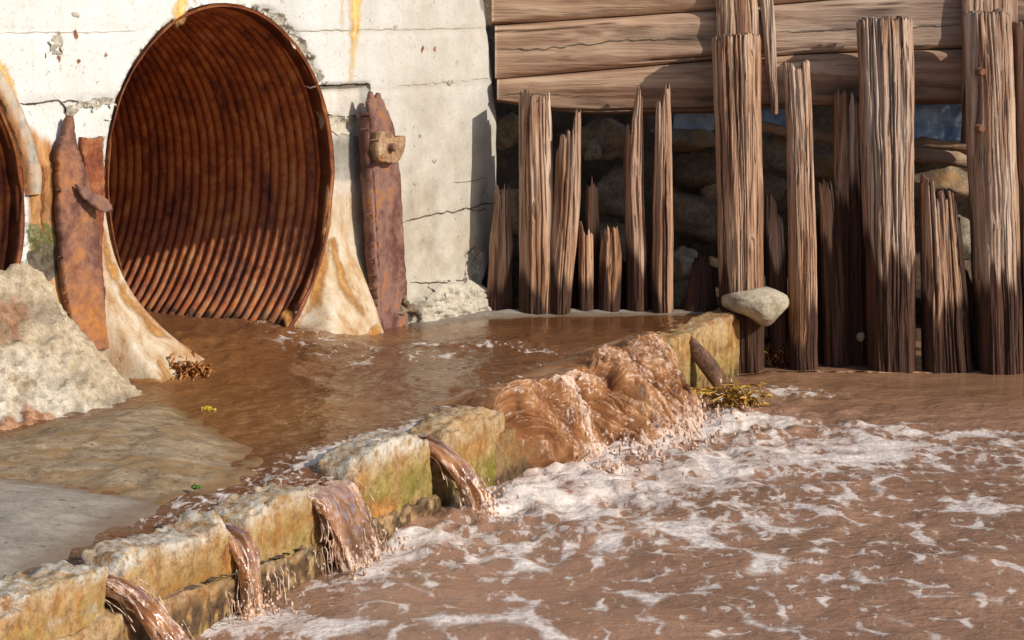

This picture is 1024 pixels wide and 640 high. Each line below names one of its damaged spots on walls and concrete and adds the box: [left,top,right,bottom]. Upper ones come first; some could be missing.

rust [173,0,187,21]
spalling [254,4,325,86]
rust [350,0,361,69]
crack [403,177,494,223]
rust [103,232,165,337]
rust [307,223,365,315]